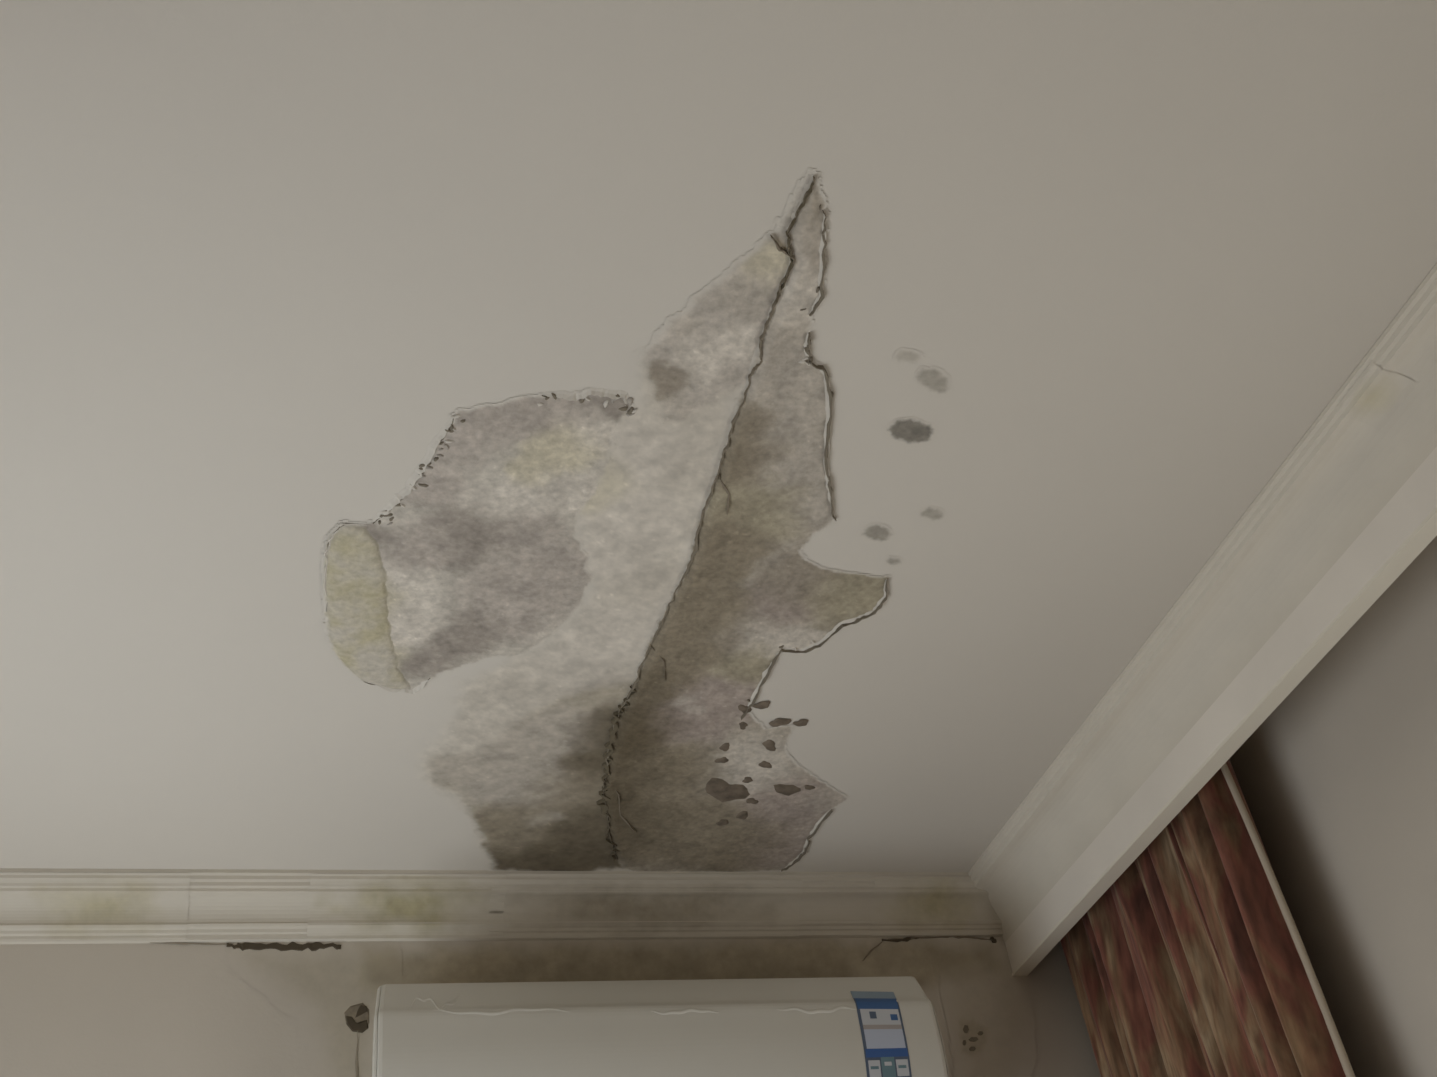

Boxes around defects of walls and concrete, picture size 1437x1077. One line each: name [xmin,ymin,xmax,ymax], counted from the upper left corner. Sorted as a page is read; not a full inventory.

crack [150,942,341,951]
peeling [321,168,891,872]
damp [226,346,1038,1077]
crack [597,175,815,862]